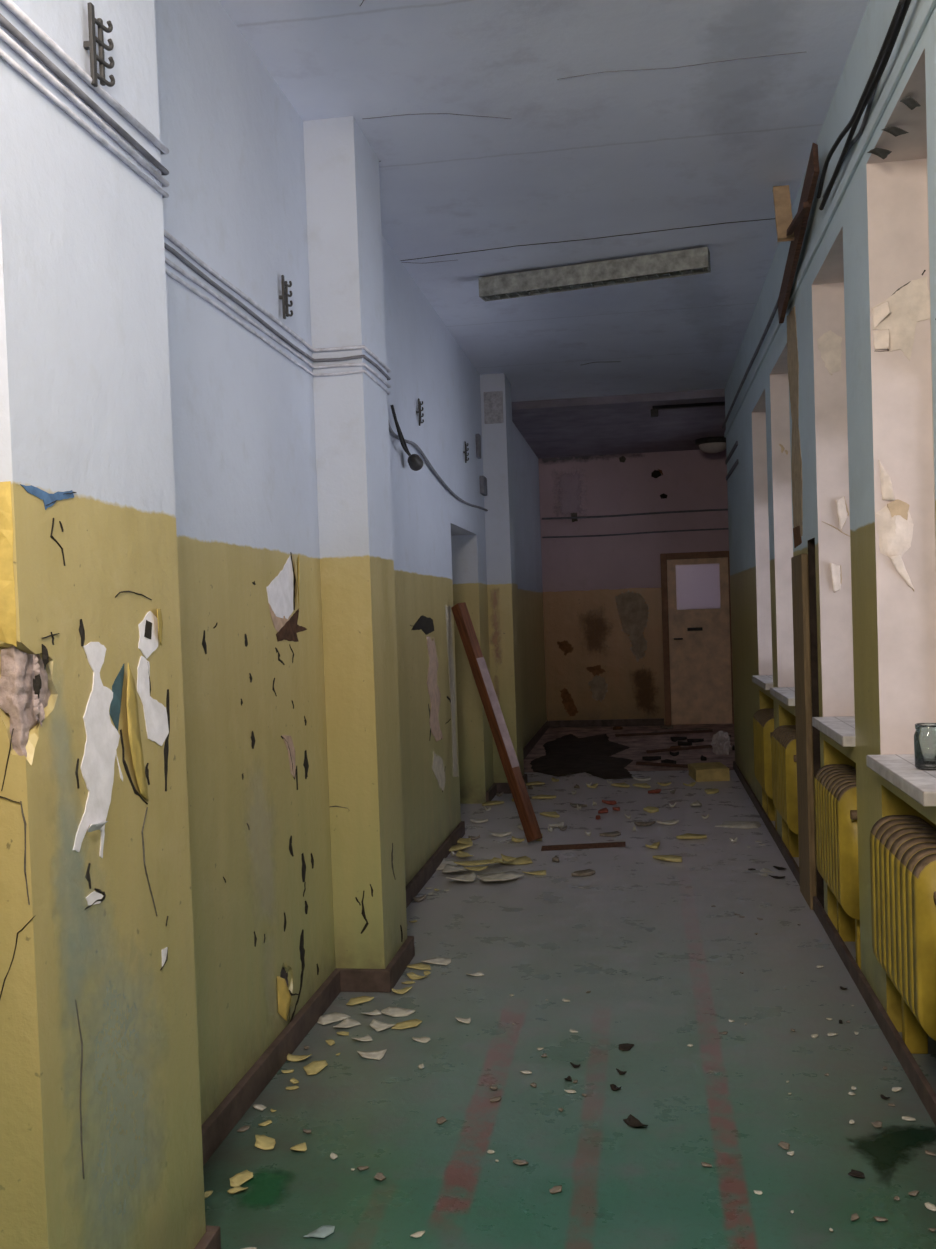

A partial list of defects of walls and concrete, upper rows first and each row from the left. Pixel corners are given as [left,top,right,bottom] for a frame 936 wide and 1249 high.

crack [0,481,17,647]
peeling [20,484,77,566]
peeling [252,552,307,665]
peeling [822,496,849,536]
peeling [830,563,842,592]
spalling [0,632,60,757]
peeling [72,591,170,910]
peeling [410,605,458,792]
peeling [289,836,314,914]